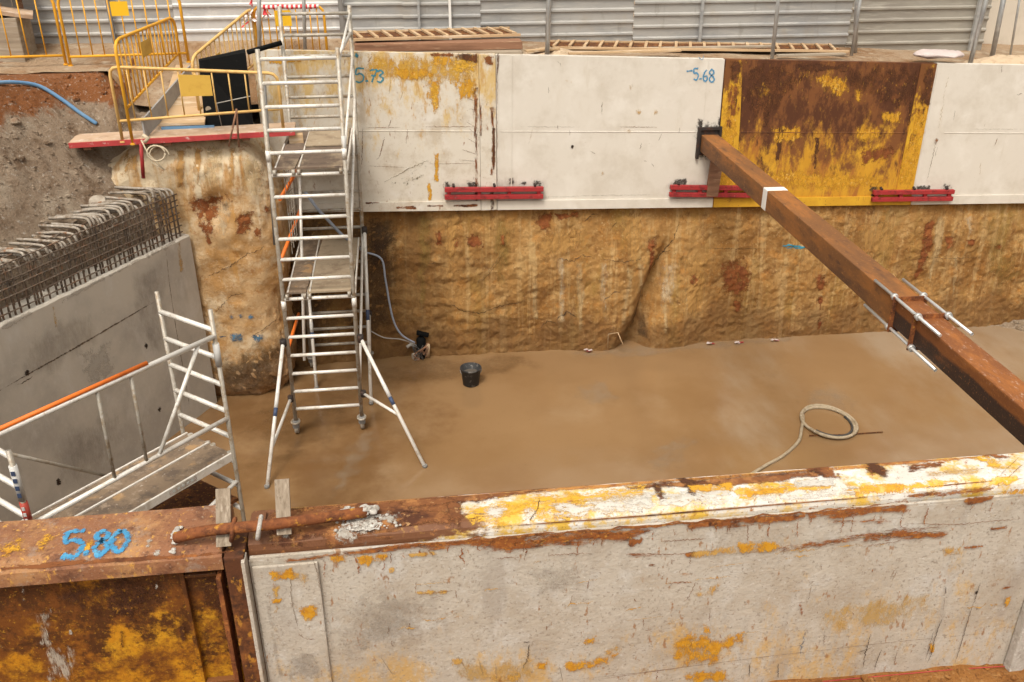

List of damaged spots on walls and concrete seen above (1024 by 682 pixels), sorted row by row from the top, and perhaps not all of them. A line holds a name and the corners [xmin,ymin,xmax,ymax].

peeling [365,54,477,112]
rust [396,52,499,210]
rust [726,61,934,146]
rust [860,145,895,166]
rust [914,220,975,279]
rust [721,256,752,312]
rust [815,274,827,329]
rust [268,455,1024,577]
peeling [465,454,1018,528]
rust [1,551,233,571]
peeling [674,627,745,682]